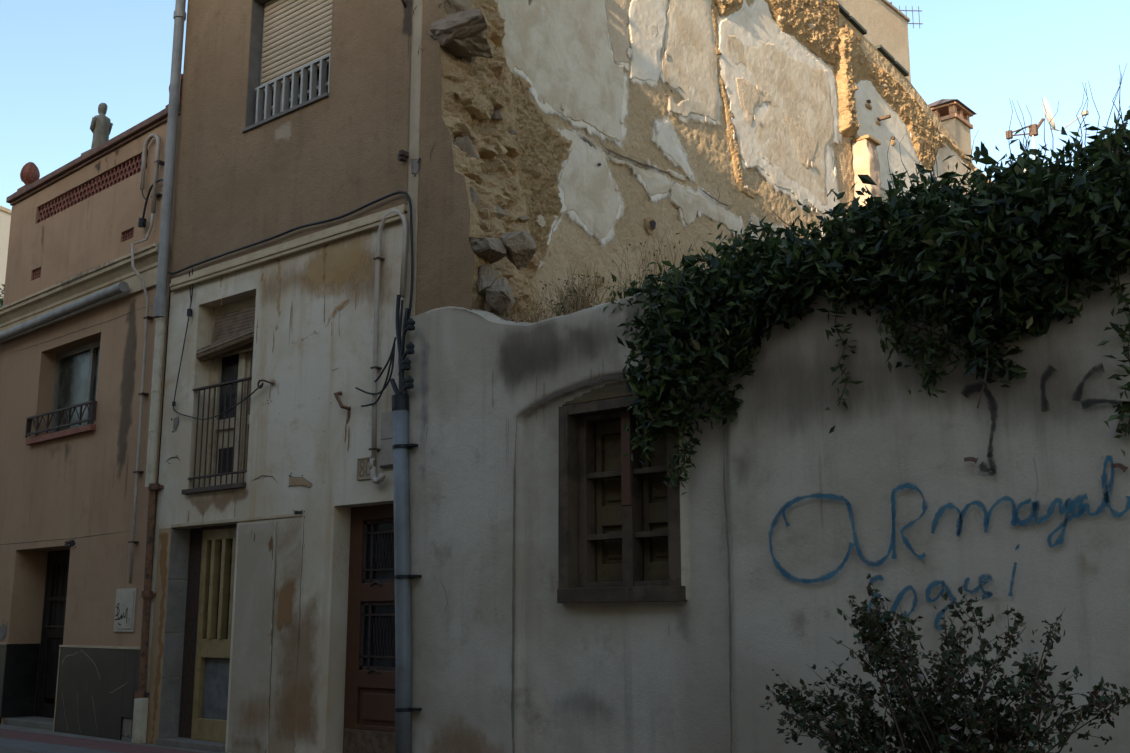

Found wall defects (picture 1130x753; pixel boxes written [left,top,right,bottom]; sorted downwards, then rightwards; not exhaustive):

spalling [411,0,992,323]
water stain [261,238,382,335]
water stain [113,302,136,490]
water stain [271,580,312,731]